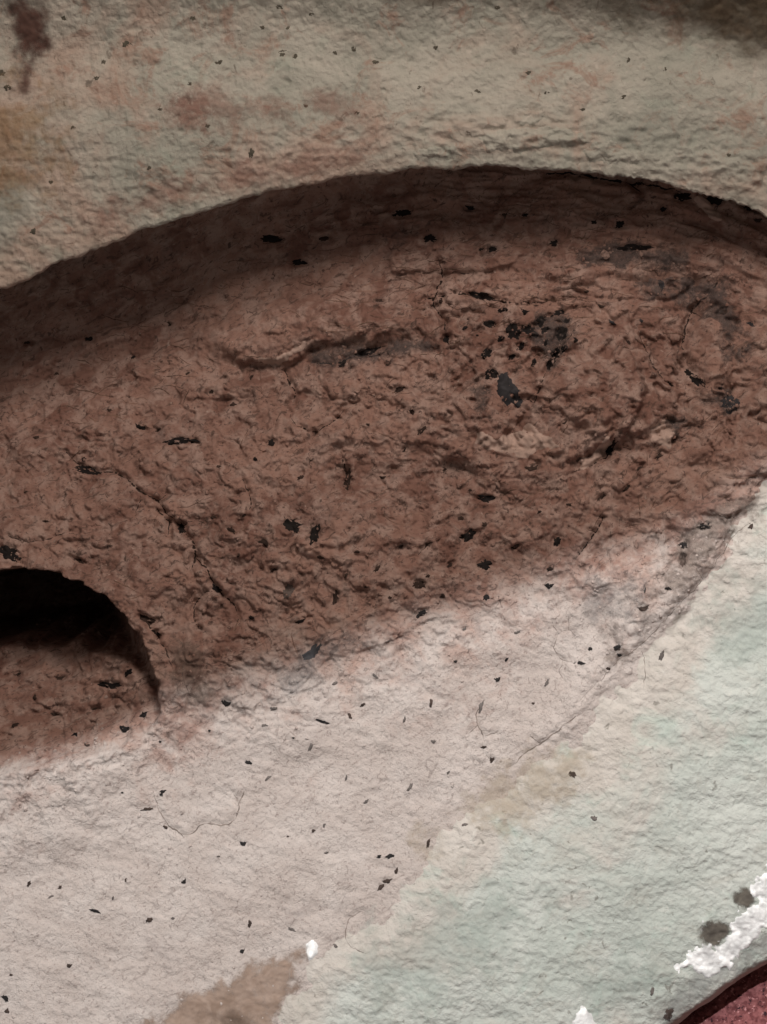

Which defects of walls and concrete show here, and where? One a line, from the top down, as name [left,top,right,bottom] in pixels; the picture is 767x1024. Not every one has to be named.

peeling [694,195,722,221]
peeling [496,372,523,408]
peeling [475,423,559,459]
peeling [579,436,612,470]
peeling [650,419,676,449]
crack [66,452,239,701]
spalling [0,569,160,776]
water stain [144,951,307,1024]